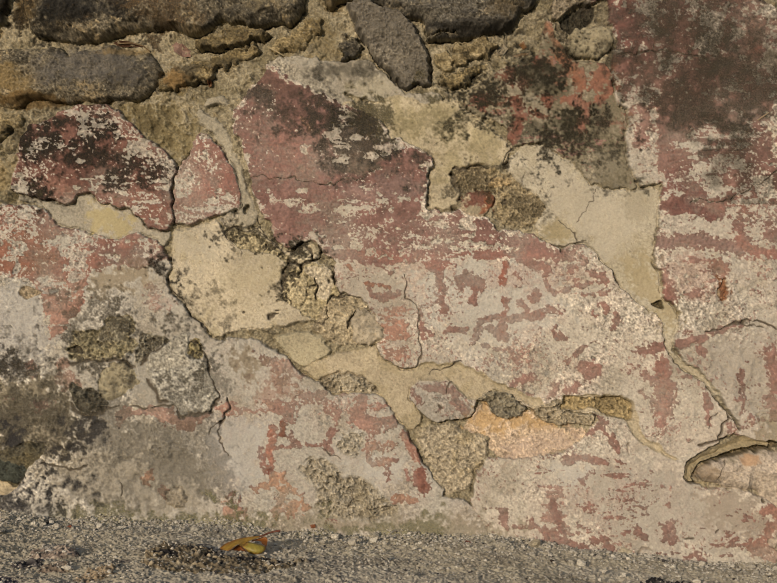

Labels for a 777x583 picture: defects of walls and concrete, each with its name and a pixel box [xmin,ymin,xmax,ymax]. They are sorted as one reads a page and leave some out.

flaking render [54,314,171,415]
crack [66,291,232,457]
flaking render [188,338,204,359]
crack [405,278,462,409]
peeling [551,324,569,343]
peeling [541,345,606,384]
crack [705,319,777,333]
crack [698,387,741,447]
flaking render [684,333,777,493]
flaking render [0,441,46,496]
peeling [476,459,672,553]
peeling [650,503,777,563]